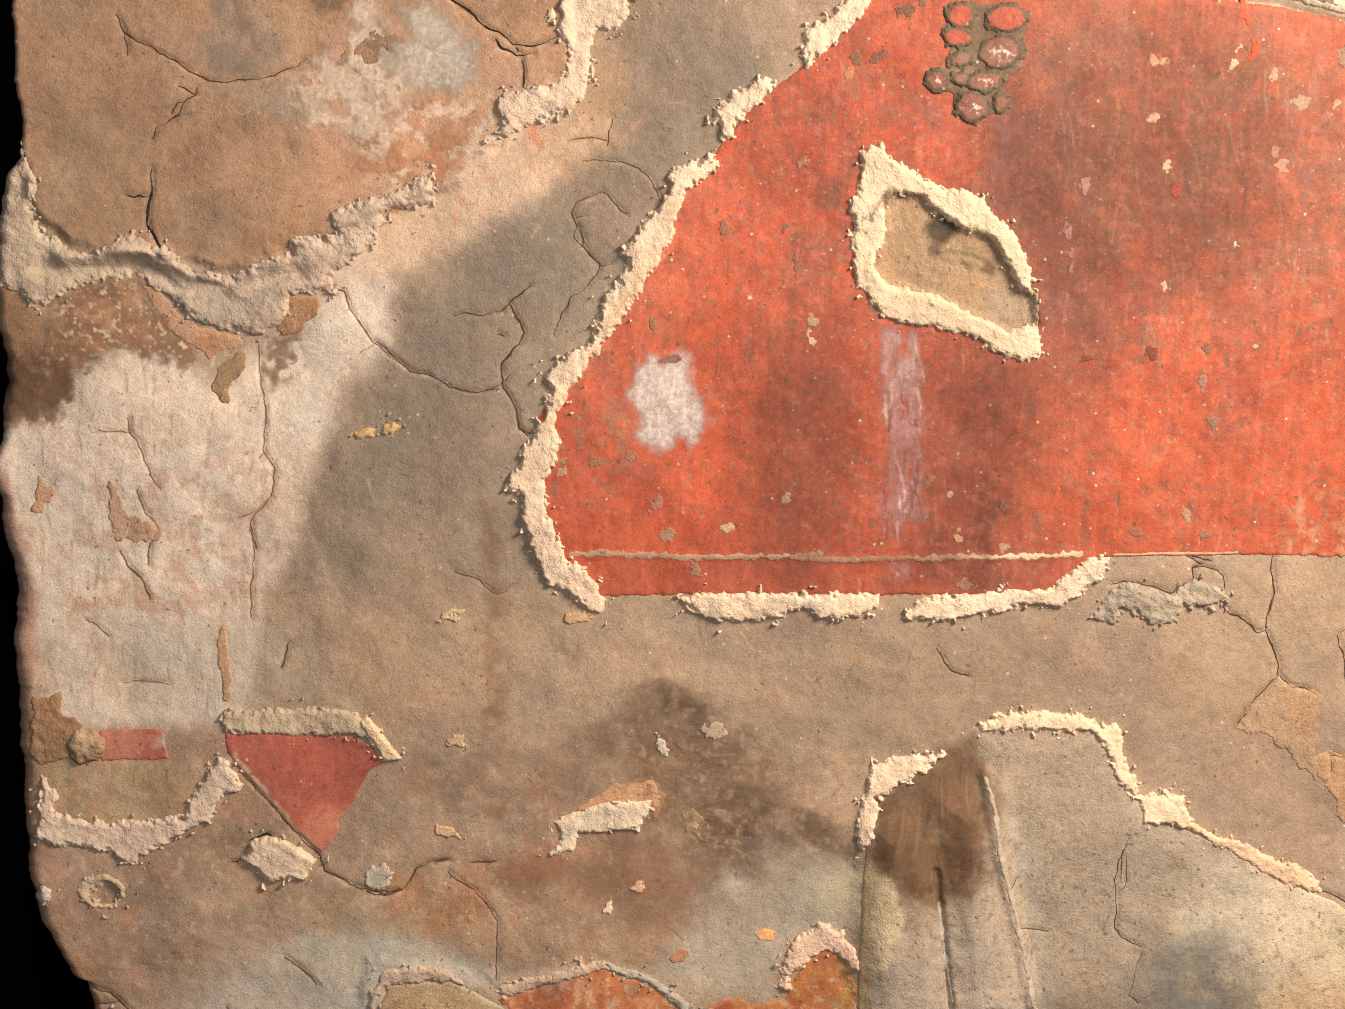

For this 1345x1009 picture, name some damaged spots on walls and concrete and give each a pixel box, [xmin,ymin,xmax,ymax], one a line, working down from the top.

crack [451,0,558,85]
crack [117,14,310,248]
spalling [842,140,1049,368]
flaking render [143,285,247,404]
flaking render [277,295,320,336]
peeling [619,353,704,464]
flaking render [31,476,55,513]
flaking render [107,480,163,543]
flaking render [215,625,232,702]
crack [1113,556,1317,725]
flaking render [577,776,666,819]
crack [1114,839,1142,1004]